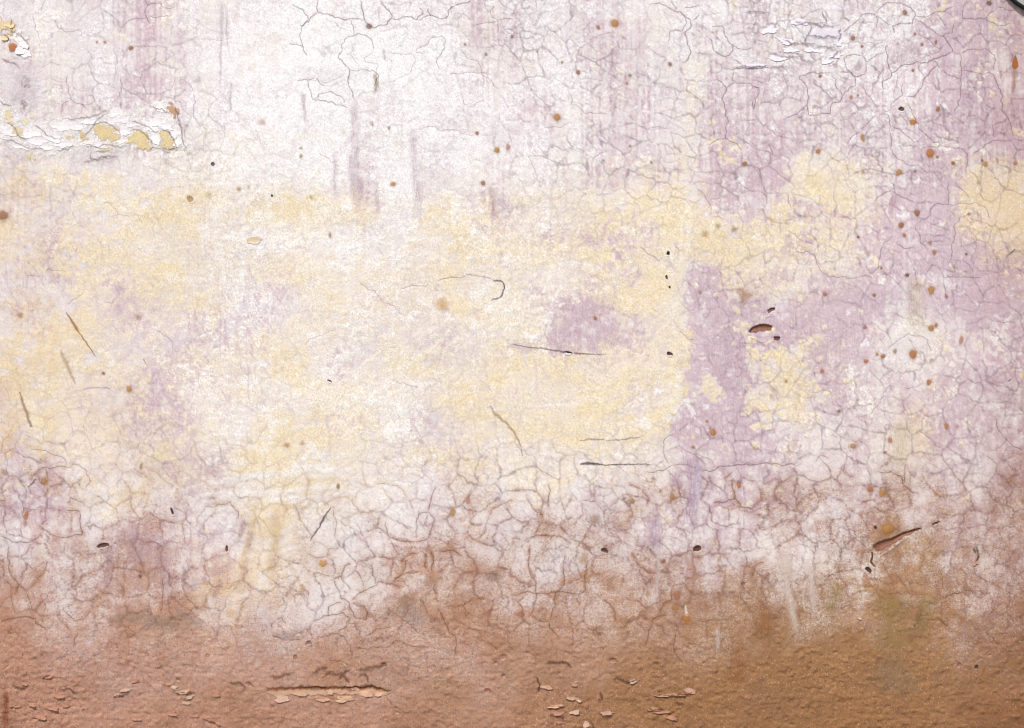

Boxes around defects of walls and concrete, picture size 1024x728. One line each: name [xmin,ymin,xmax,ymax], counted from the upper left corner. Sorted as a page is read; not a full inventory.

peeling [737,15,843,68]
peeling [0,17,188,165]
spalling [749,307,780,344]
spalling [865,521,940,573]
spalling [266,663,391,703]
peeling [547,682,615,728]
peeling [647,688,695,721]